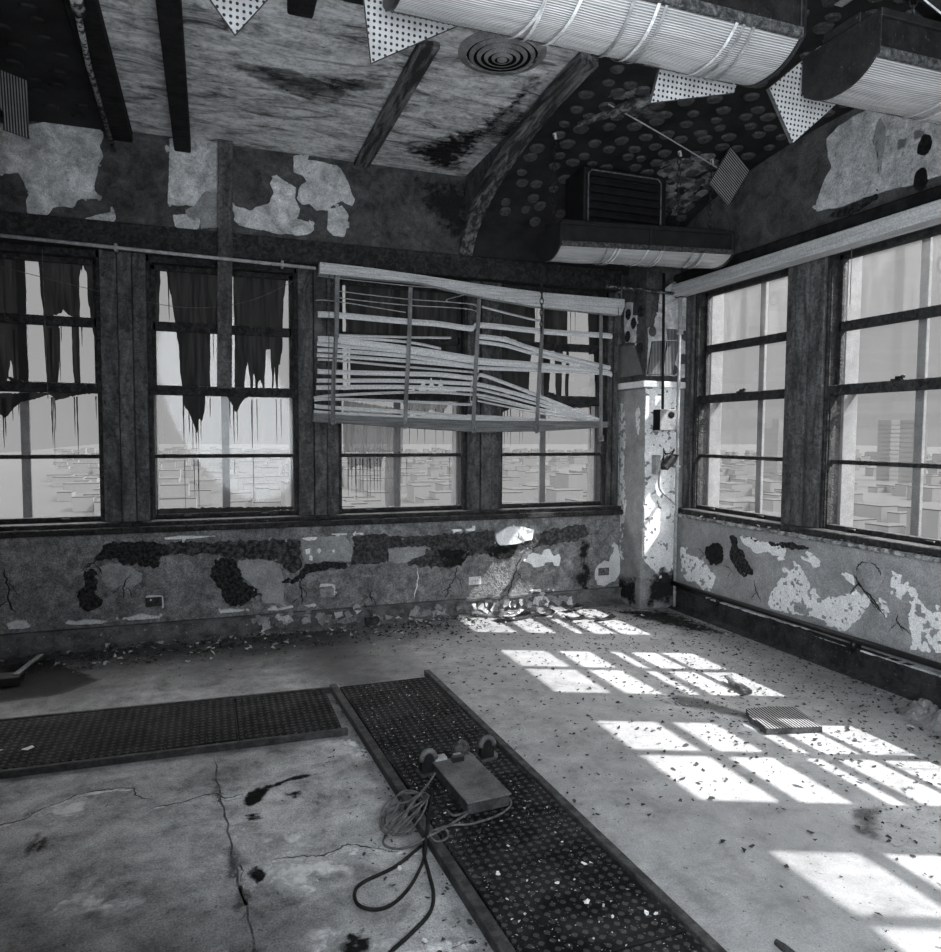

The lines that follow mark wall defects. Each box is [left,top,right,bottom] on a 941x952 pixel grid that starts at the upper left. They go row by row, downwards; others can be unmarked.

leakage [235,64,383,103]
peeling [0,122,104,215]
peeling [85,207,116,222]
peeling [165,138,218,230]
peeling [233,154,355,237]
peeling [595,282,941,653]
spalling [66,523,589,632]
peeling [860,650,941,677]
crack [0,759,256,952]
crack [271,843,400,860]